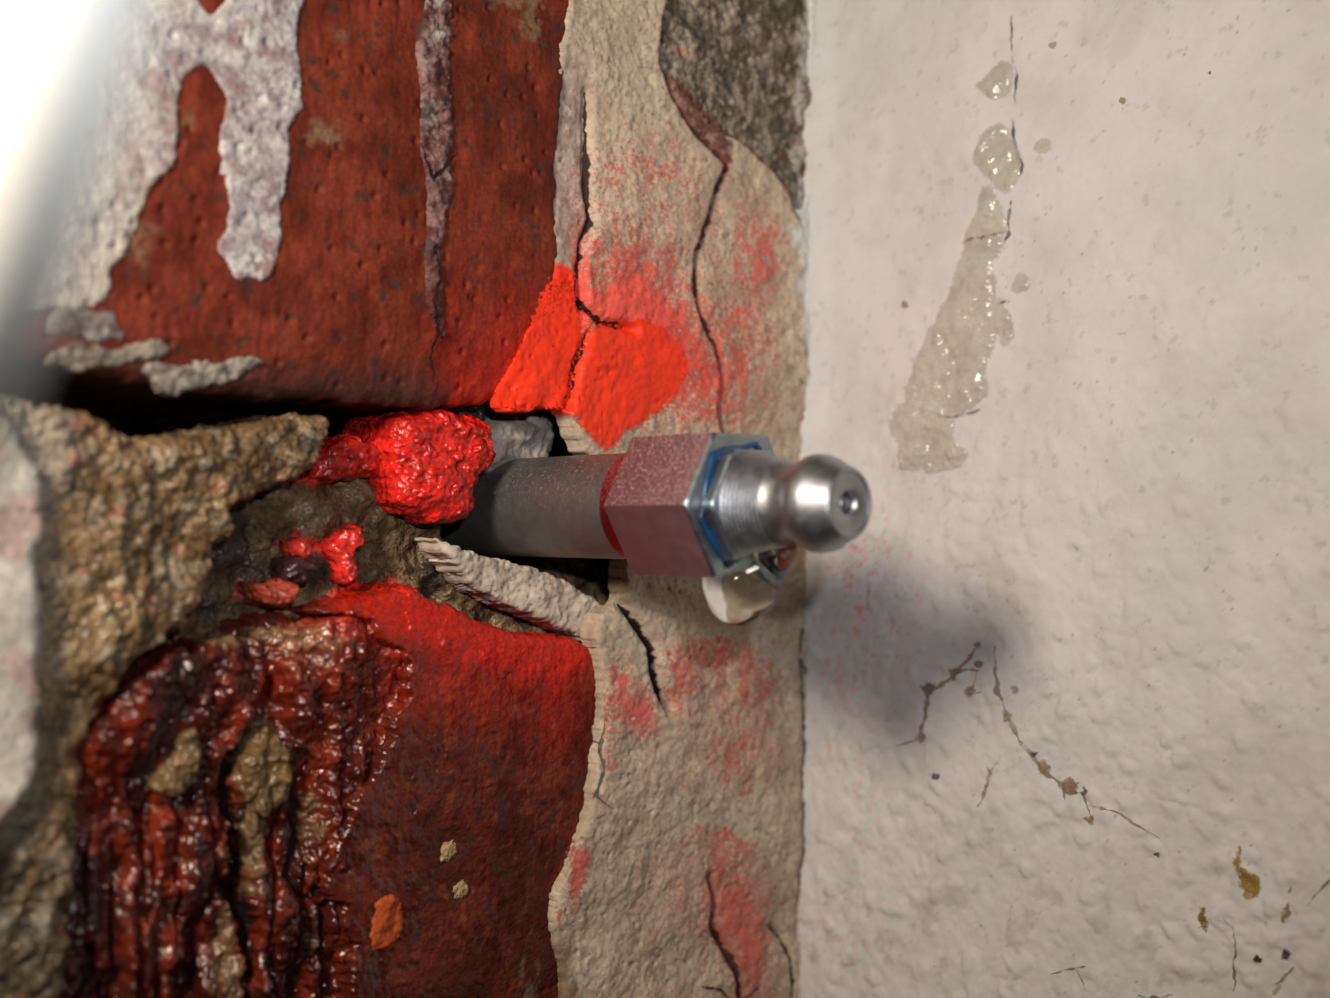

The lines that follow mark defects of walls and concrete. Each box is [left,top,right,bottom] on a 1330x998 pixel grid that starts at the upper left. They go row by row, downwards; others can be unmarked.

peeling [43,0,305,397]
crack [563,92,626,402]
crack [673,101,728,384]
crack [616,603,661,705]
crack [701,615,807,998]